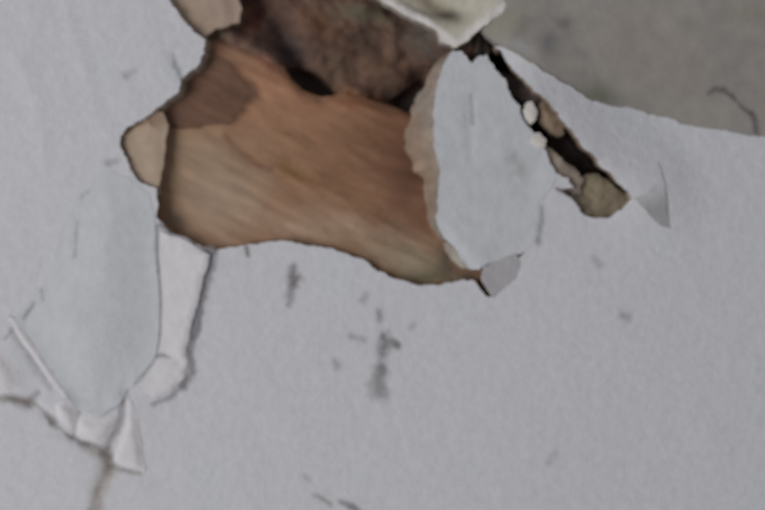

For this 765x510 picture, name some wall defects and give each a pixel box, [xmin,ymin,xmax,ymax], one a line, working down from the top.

spalling [120,0,765,397]
peeling [0,348,20,395]
peeling [55,392,146,473]
crack [156,246,216,403]